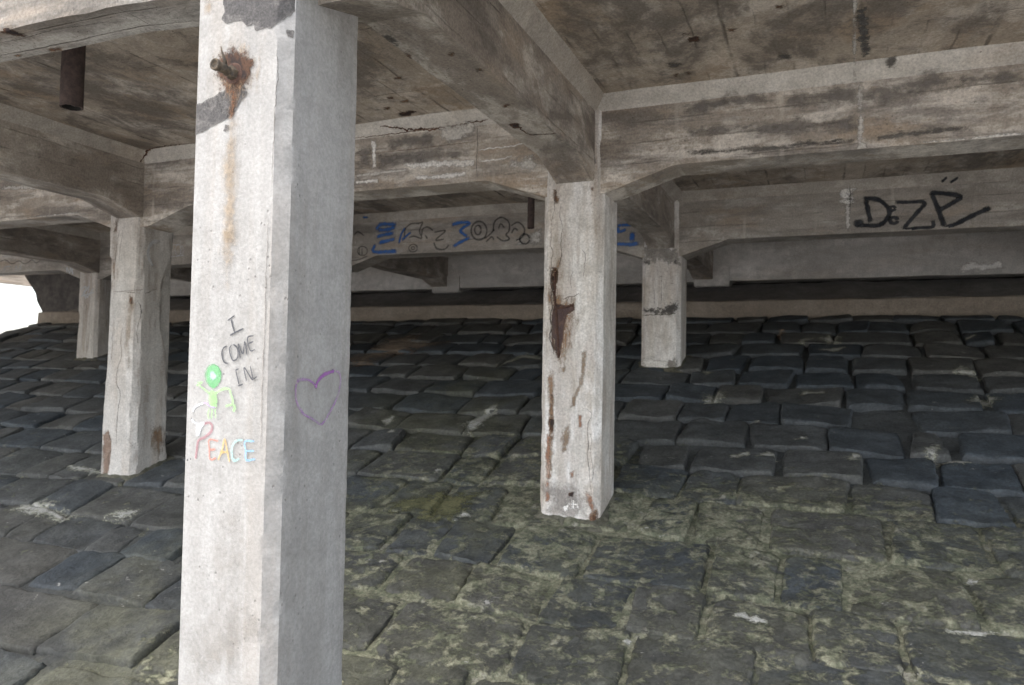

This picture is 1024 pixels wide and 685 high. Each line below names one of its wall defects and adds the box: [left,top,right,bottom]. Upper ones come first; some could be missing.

rust [216,45,254,118]
crack [356,104,555,171]
damp [686,72,1023,155]
rust [545,352,586,501]
rust [586,494,598,521]